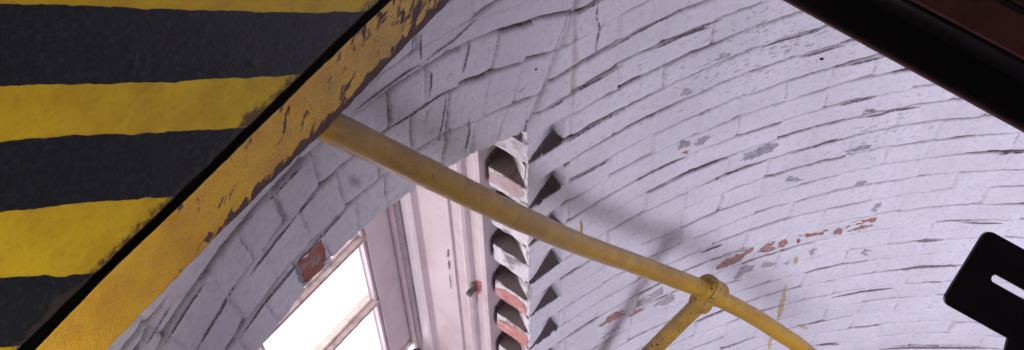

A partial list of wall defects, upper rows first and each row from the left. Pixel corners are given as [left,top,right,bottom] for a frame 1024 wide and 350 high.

flaking render [295,240,331,285]
peeling [716,201,882,279]
flaking render [495,288,527,316]
flaking render [497,320,528,347]